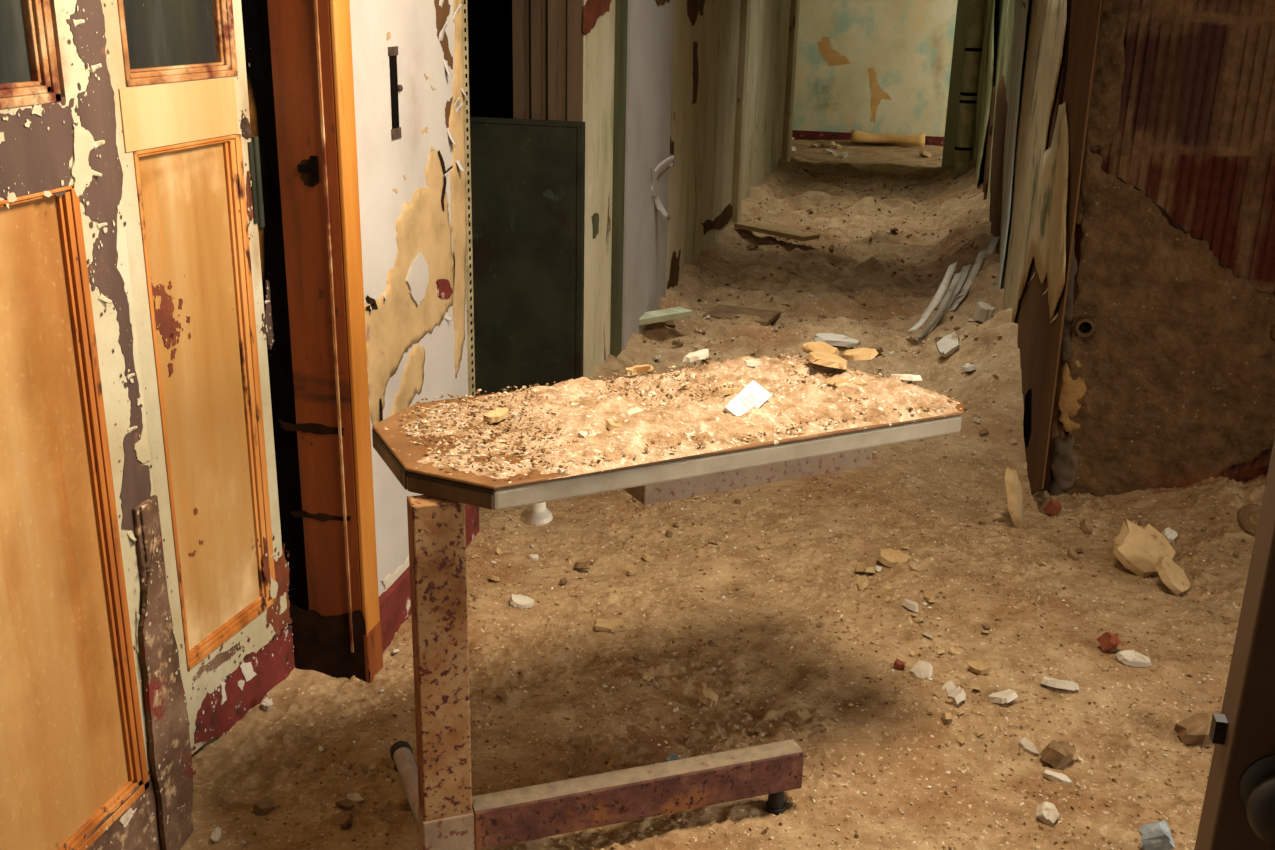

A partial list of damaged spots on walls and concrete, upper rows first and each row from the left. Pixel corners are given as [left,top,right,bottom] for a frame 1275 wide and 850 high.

spalling [817,36,851,66]
spalling [233,109,252,141]
spalling [868,68,891,123]
peeling [239,163,253,239]
spalling [364,0,468,426]
peeling [973,0,1128,496]
peeling [0,0,248,850]
peeling [256,521,292,644]
spalling [261,693,273,711]